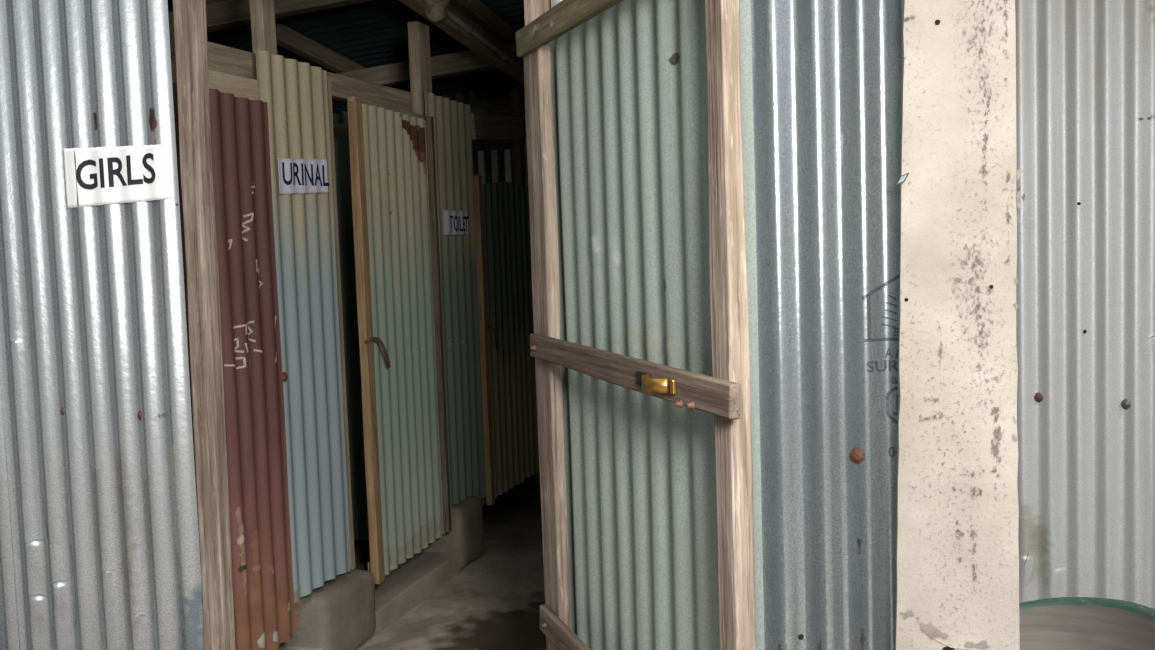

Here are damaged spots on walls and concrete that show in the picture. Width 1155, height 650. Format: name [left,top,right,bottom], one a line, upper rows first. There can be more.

corrosion [400,114,427,174]
corrosion [236,531,299,650]